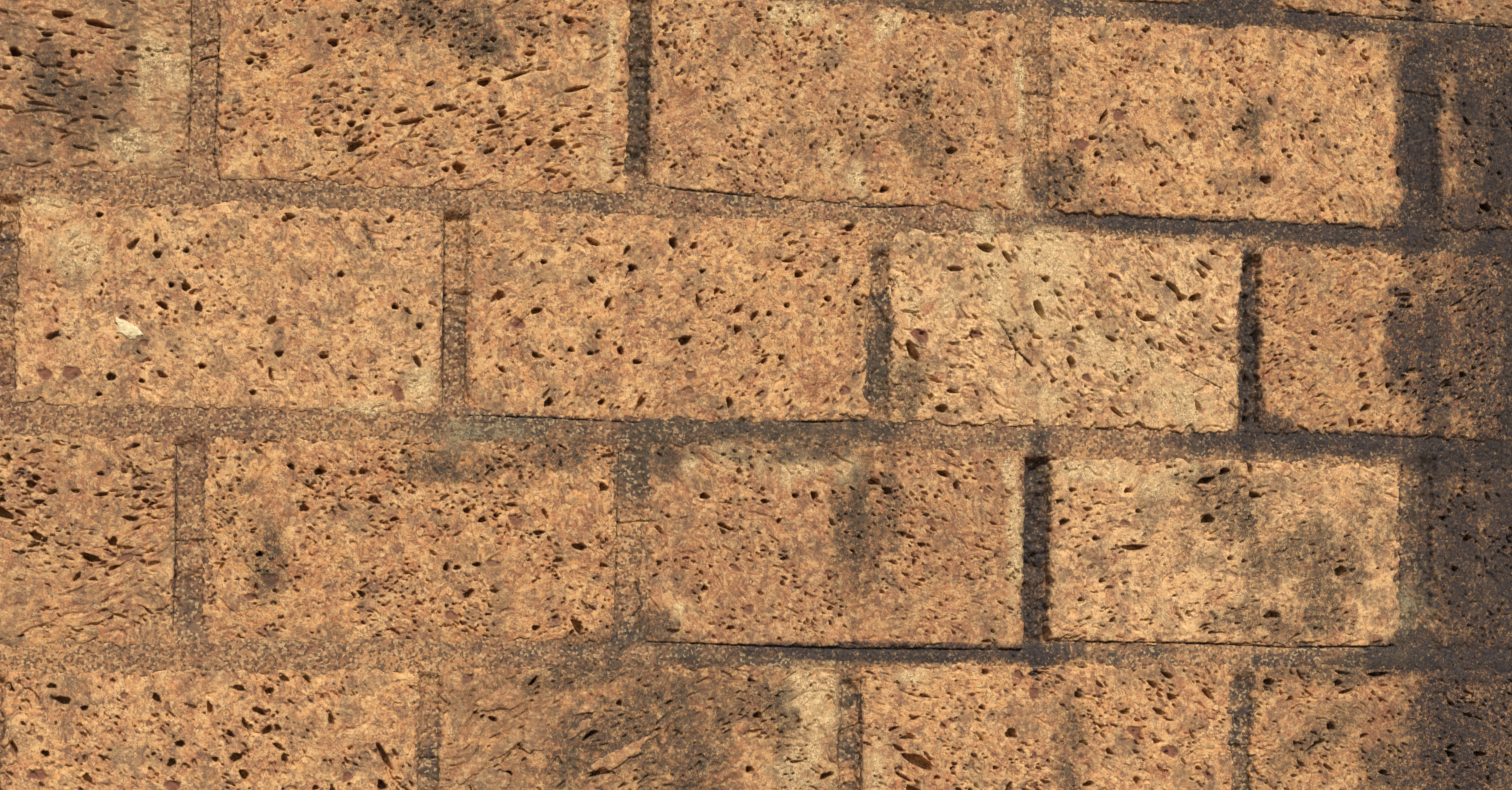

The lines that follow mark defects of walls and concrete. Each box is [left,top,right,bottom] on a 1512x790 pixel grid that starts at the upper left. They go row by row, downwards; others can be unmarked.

water stain [524,0,1512,790]